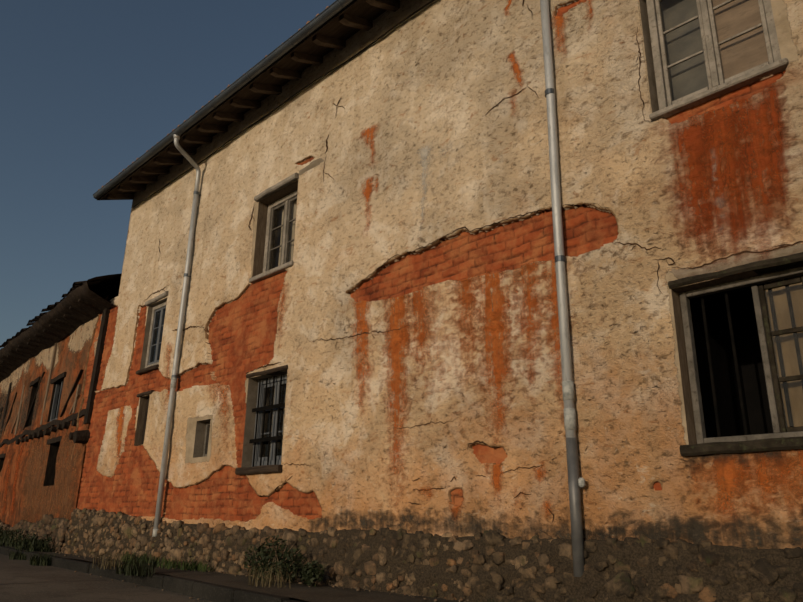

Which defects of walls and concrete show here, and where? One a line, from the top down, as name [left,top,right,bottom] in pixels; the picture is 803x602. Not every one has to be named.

peeling [554,0,587,17]
crack [486,86,538,115]
corrosion [672,84,787,243]
peeling [346,202,619,302]
crack [616,241,803,293]
peeling [0,271,322,522]
crack [309,325,412,342]
corrosion [355,300,370,403]
corrosion [387,289,427,471]
corrosion [458,268,510,428]
corrosion [520,259,562,381]
peeling [468,442,507,464]